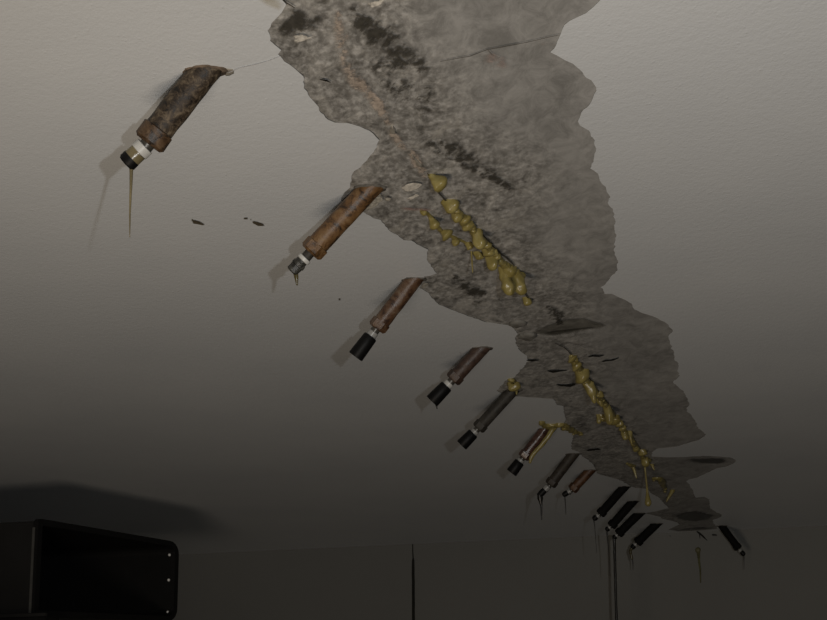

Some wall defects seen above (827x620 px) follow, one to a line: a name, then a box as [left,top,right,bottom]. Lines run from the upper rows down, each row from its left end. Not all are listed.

crack [483,235,515,266]
peeling [268,0,735,531]